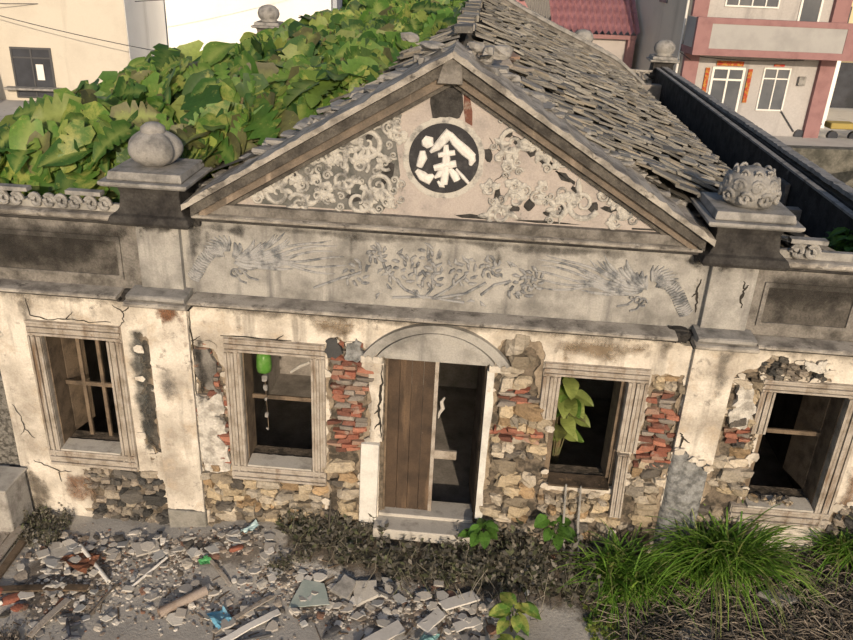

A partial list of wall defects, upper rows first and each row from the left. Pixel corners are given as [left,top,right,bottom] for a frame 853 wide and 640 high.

crack [25,299,129,327]
spalling [193,337,375,527]
spalling [479,334,686,551]
spalling [693,355,840,537]
spalling [817,501,853,551]